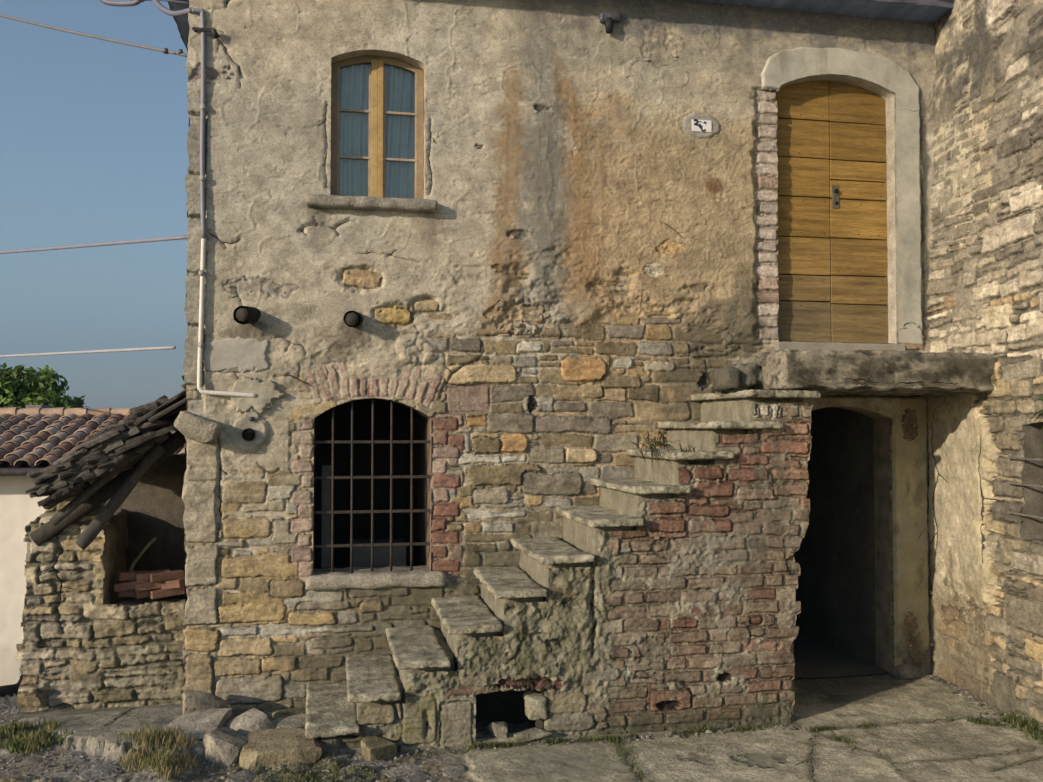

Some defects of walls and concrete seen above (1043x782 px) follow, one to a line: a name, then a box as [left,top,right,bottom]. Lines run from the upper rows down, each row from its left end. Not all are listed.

crack [210,0,241,86]
crack [428,123,436,193]
leakage [513,16,574,326]
leakage [546,0,1001,331]
crack [302,220,352,235]
peeling [900,403,921,441]
crack [614,739,642,782]
crack [796,712,1043,782]